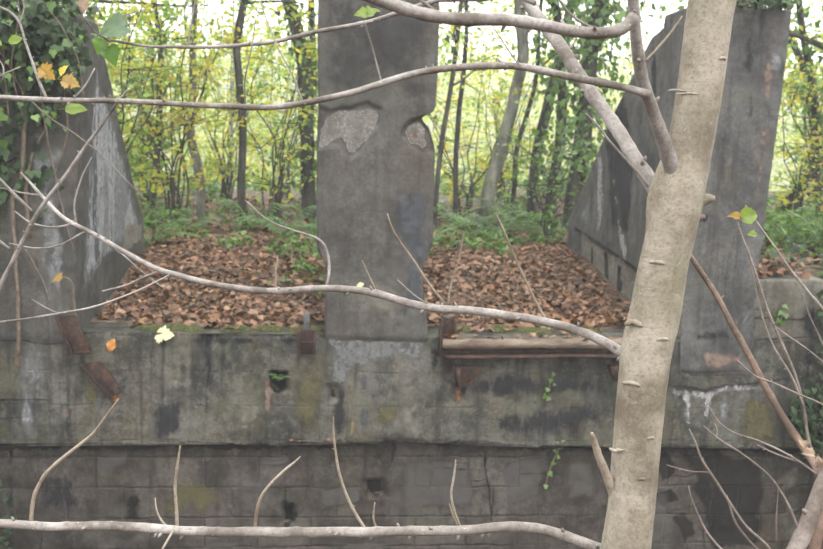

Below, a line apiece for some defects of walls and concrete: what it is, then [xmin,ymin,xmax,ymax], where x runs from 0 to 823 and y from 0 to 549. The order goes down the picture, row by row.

spalling [318,108,380,153]
spalling [405,122,427,149]
leakage [154,404,180,439]
leakage [499,405,597,433]
leakage [677,385,750,423]